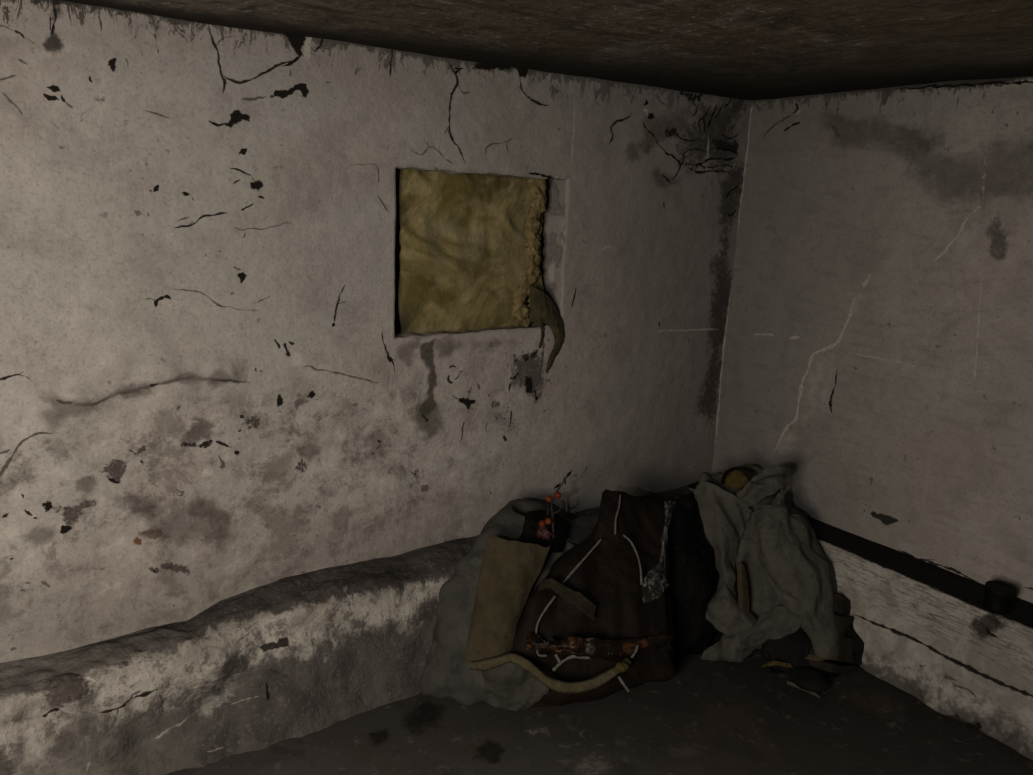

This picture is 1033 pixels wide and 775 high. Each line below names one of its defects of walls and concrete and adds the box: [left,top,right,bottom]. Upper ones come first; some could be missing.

crack [209,29,290,92]
spalling [208,34,311,128]
crack [415,65,511,163]
crack [516,68,548,106]
crack [528,171,559,179]
damp [643,91,739,184]
crack [175,212,288,237]
spalling [544,181,565,292]
damp [419,341,518,441]
damp [509,338,545,400]
crack [0,432,52,476]
crack [856,615,1033,697]